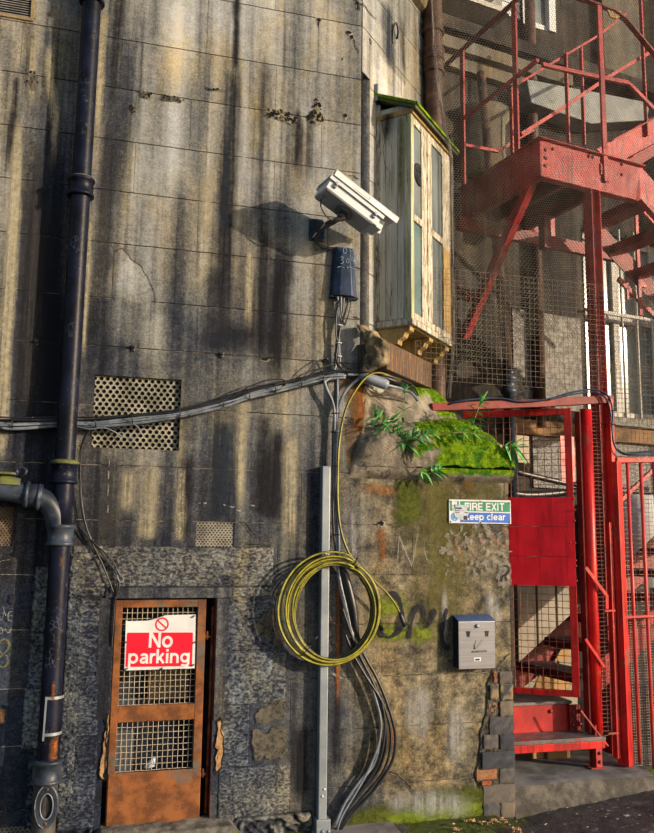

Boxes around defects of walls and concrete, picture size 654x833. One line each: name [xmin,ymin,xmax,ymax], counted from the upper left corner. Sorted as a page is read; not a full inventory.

leakage [95,0,124,126]
spalling [130,90,184,113]
spalling [265,98,325,126]
leakage [0,39,59,419]
leakage [218,77,246,297]
leakage [246,73,292,373]
rust [352,380,365,431]
leakage [254,419,296,531]
leakage [394,481,469,623]
peeling [439,523,512,587]
spalling [98,712,109,780]
spalling [215,717,225,775]